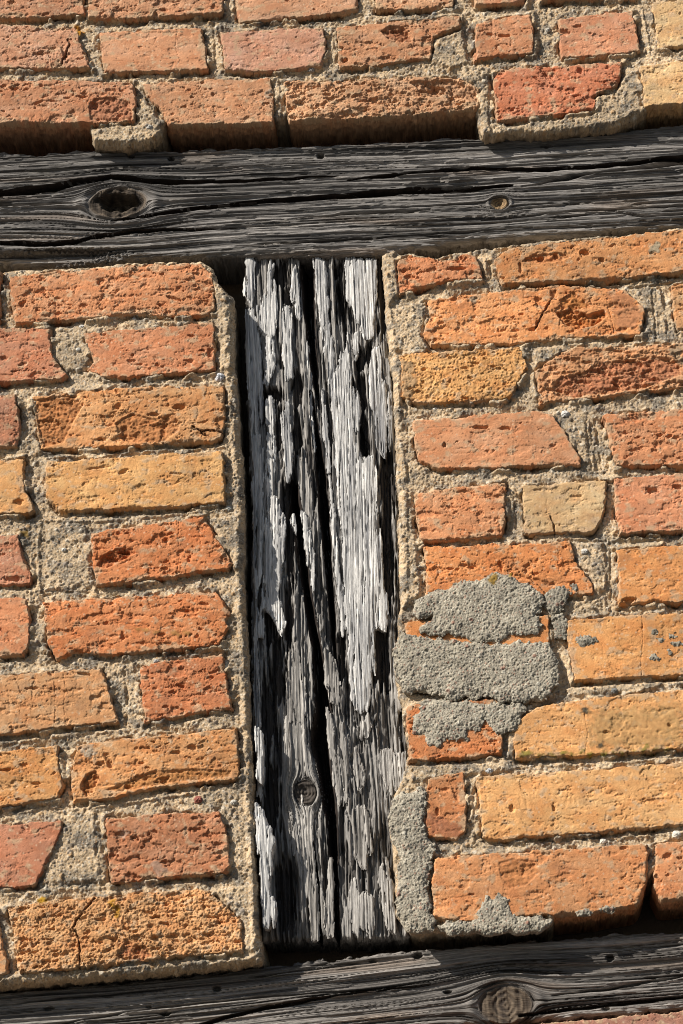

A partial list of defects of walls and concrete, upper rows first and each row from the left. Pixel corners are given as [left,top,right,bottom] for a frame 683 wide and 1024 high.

crack [73,898,96,969]